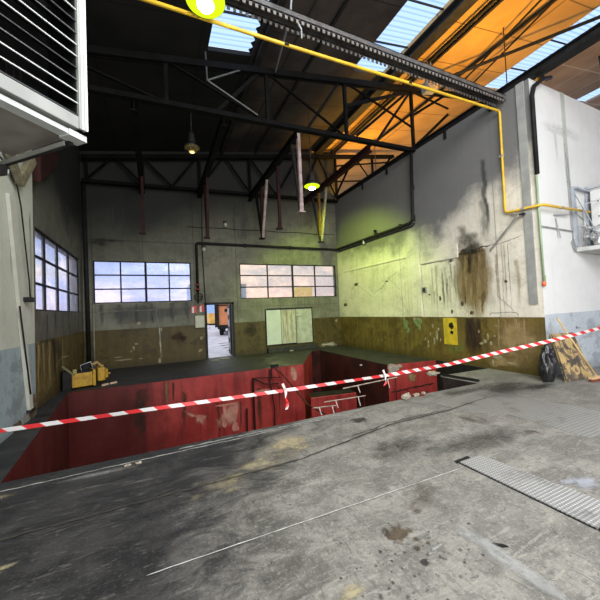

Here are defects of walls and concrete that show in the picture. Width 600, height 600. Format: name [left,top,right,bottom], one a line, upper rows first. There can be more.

leakage [481,161,489,225]
spalling [1,364,306,483]